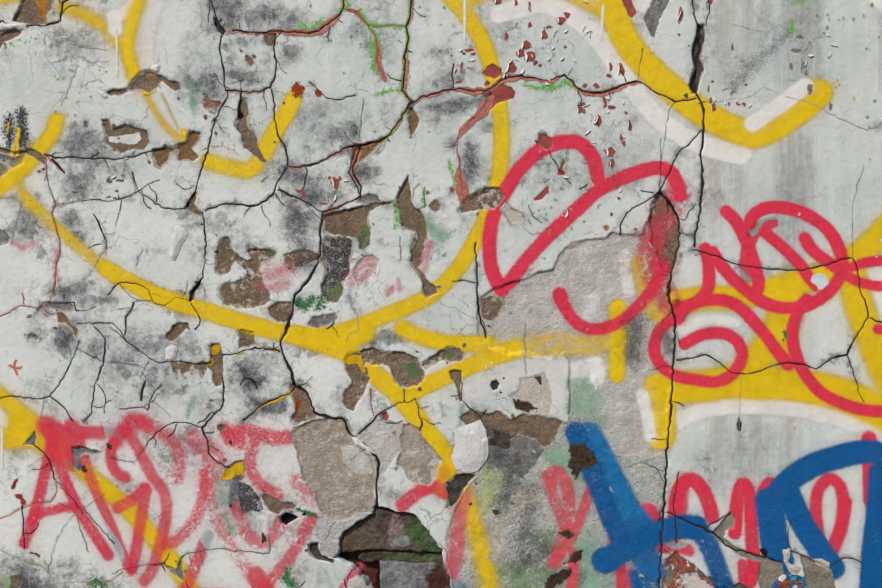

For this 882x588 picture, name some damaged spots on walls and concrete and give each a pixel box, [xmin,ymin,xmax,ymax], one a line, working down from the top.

crack [0,147,166,317]
flaking render [96,64,180,100]
flaking render [101,118,200,170]
flaking render [214,176,442,328]
crack [111,0,705,437]
peeling [450,0,576,109]
crack [0,263,209,422]
crack [0,443,270,588]
crack [111,375,231,468]
flaking render [221,458,306,525]
flaking render [282,187,748,588]
crack [651,192,882,588]